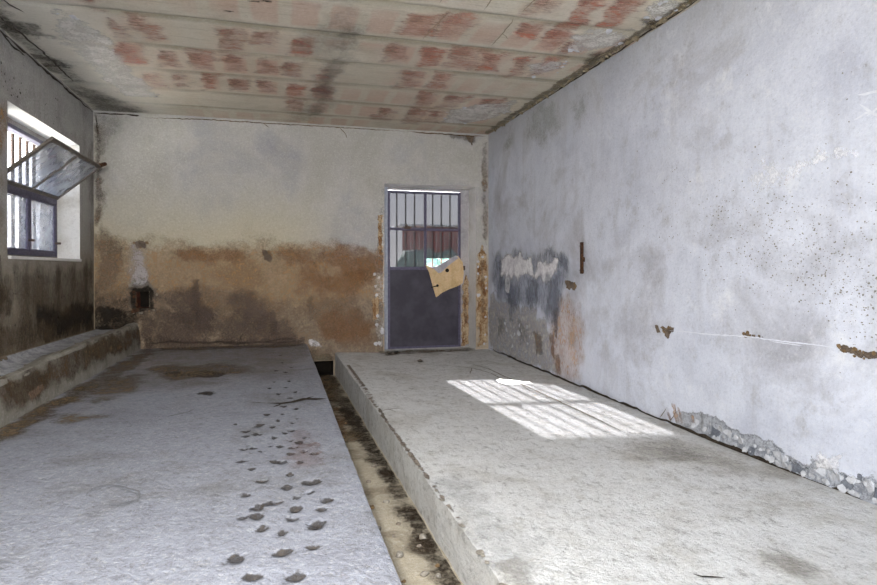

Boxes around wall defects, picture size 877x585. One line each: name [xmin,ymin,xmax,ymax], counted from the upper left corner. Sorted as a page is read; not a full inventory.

damp [0,0,136,113]
spalling [443,0,697,133]
flaking render [0,329,114,376]
spalling [127,241,158,315]
damp [0,231,383,409]
damp [500,252,567,337]
flaking render [674,411,877,506]